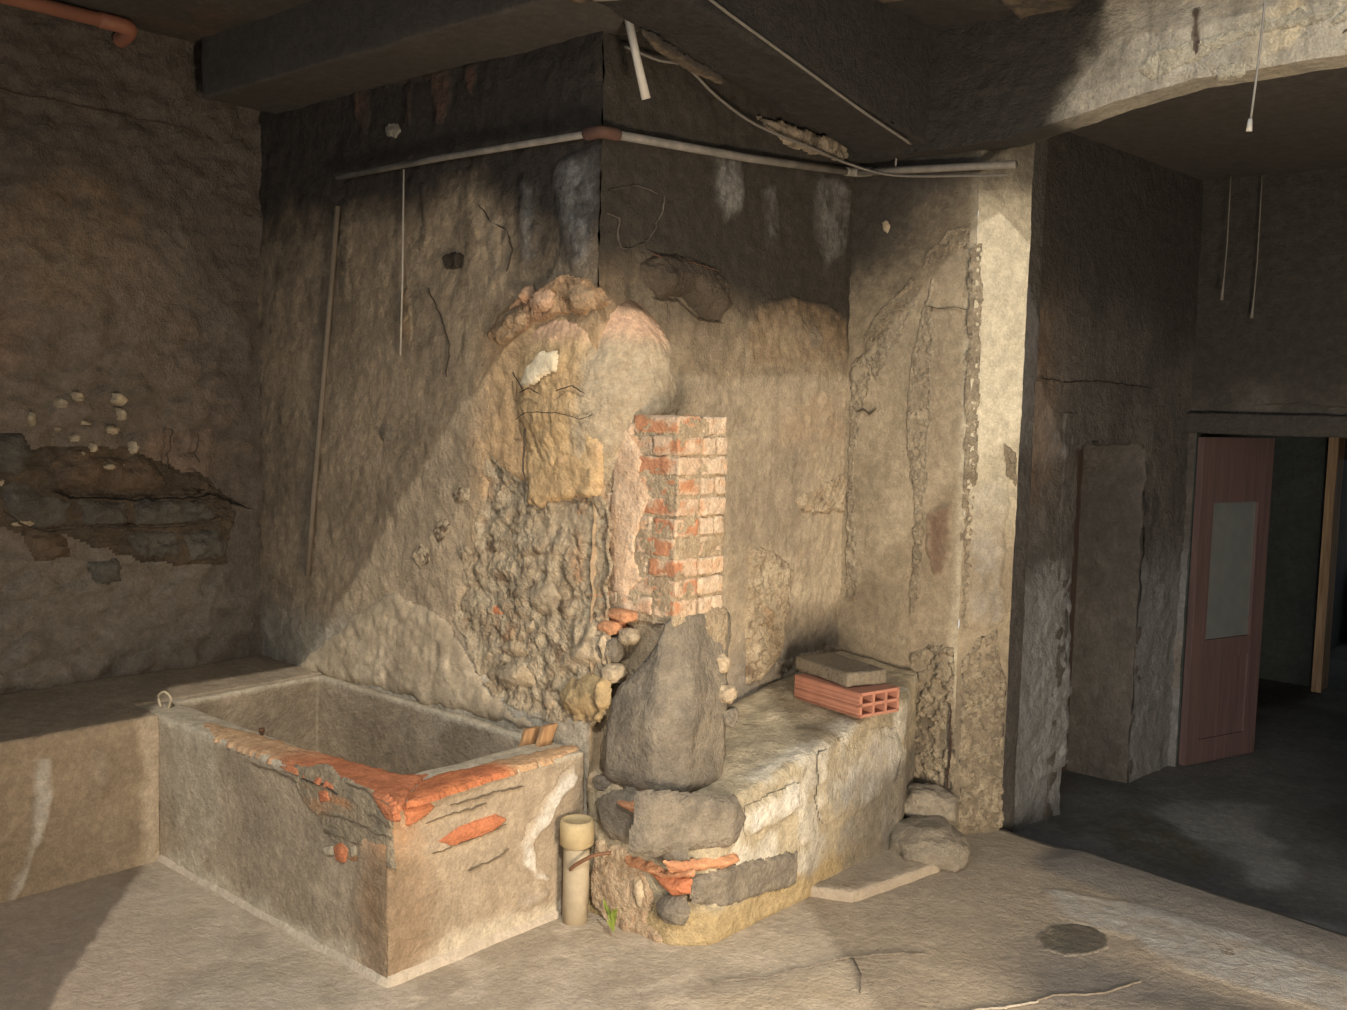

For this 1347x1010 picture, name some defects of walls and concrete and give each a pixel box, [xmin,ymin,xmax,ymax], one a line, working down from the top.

peeling [641,28,732,86]
flaking render [756,116,848,161]
crack [477,204,513,272]
crack [607,185,665,249]
crack [428,288,450,377]
spalling [0,392,236,585]
spalling [452,426,613,726]
flaking render [203,723,578,871]
leakage [1035,883,1347,1010]
crack [972,981,1141,1010]